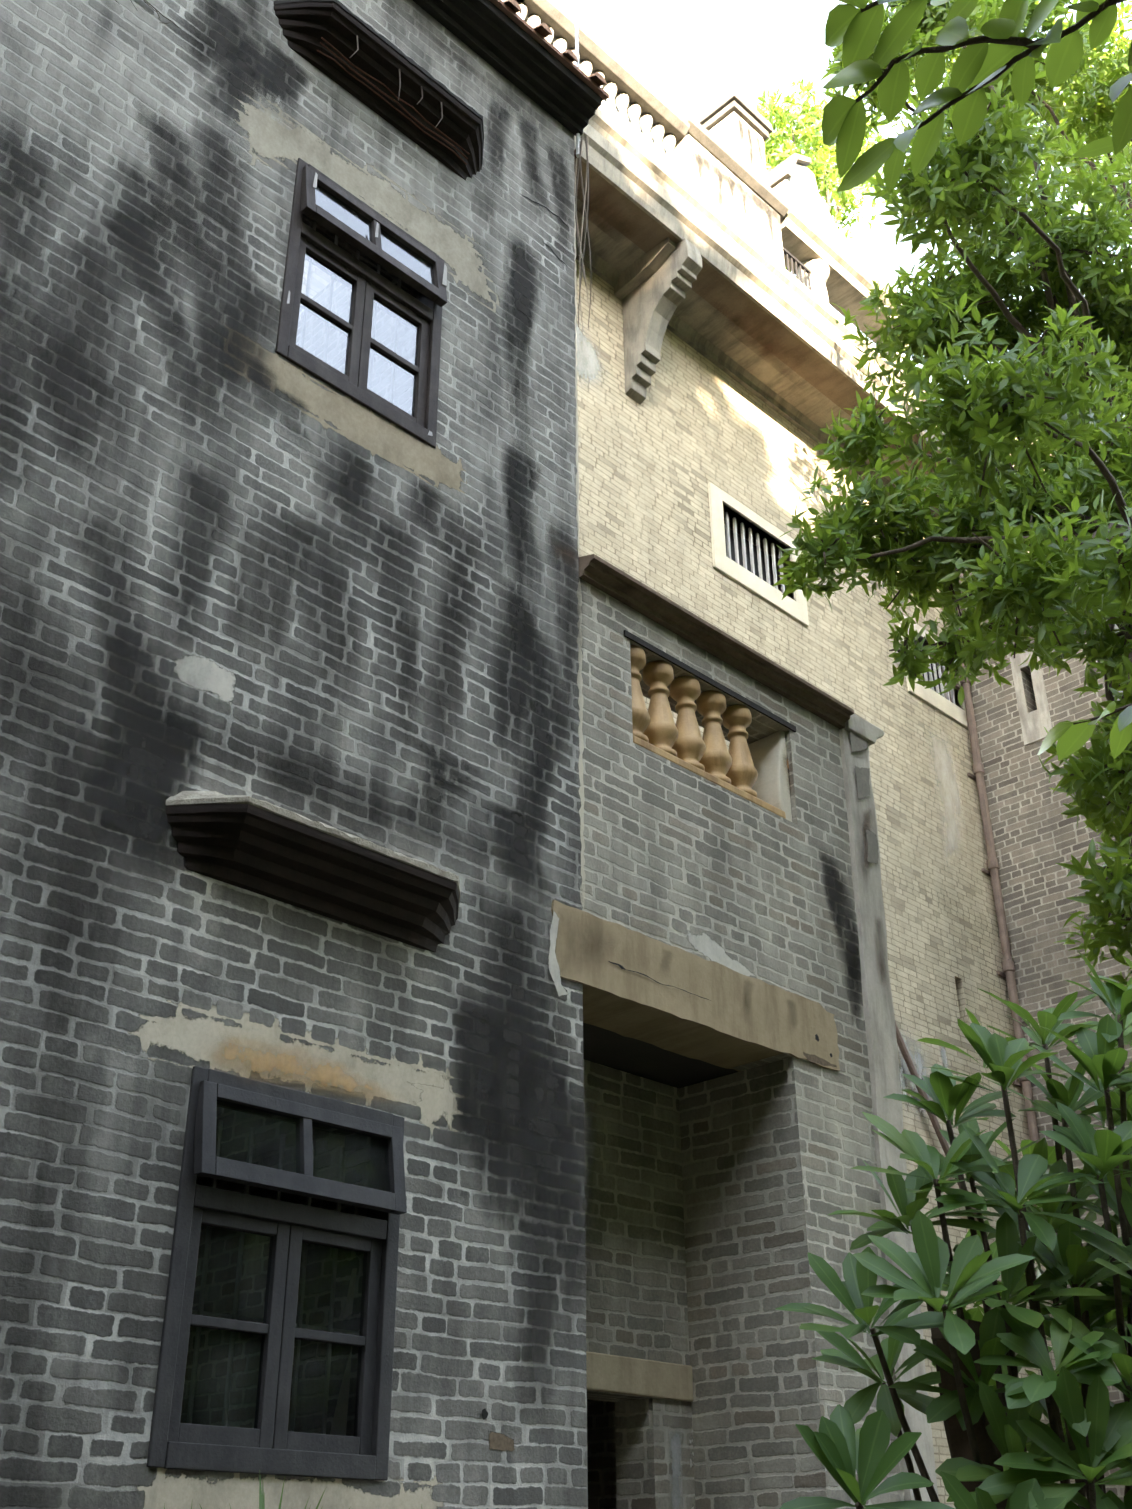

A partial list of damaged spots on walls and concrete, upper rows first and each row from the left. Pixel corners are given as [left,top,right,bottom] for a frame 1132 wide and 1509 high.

spalling [548,910,568,997]
crack [608,961,711,1001]